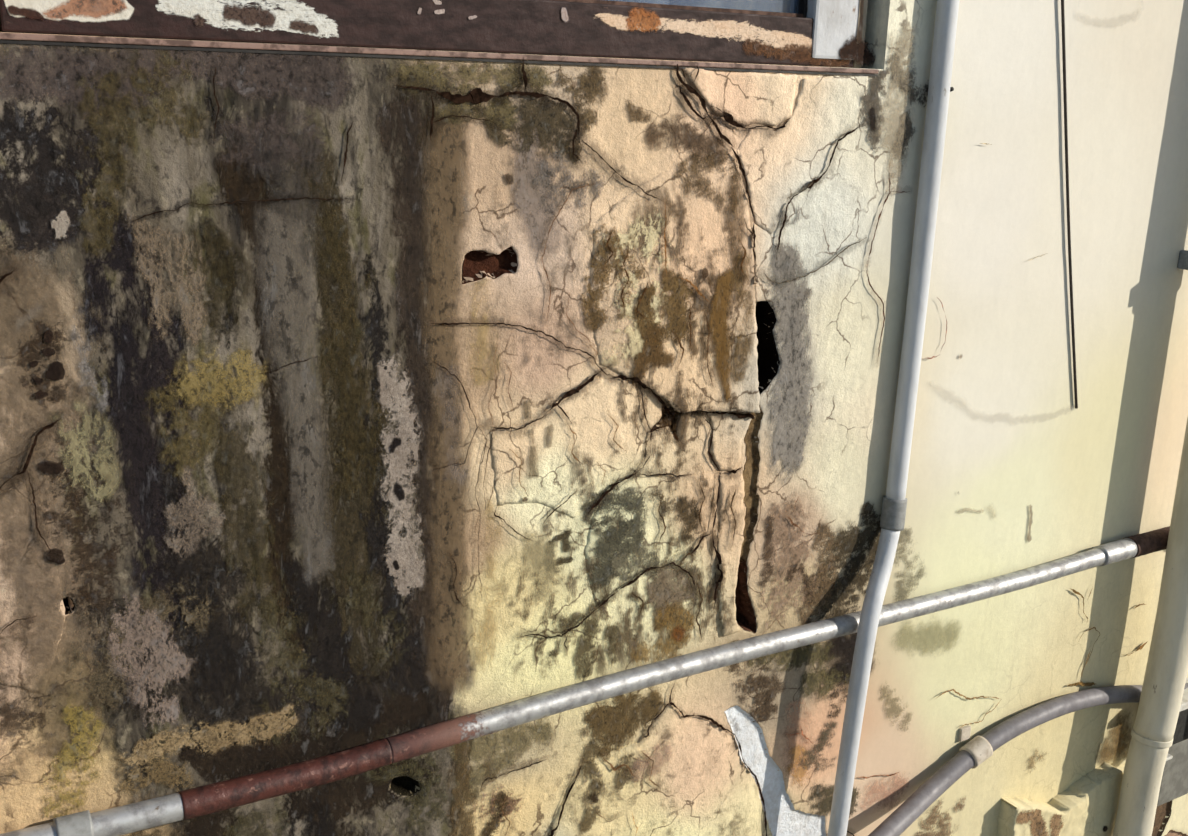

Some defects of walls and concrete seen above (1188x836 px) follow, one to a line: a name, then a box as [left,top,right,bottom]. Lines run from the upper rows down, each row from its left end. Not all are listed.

peeling [4,0,134,22]
peeling [155,0,339,38]
water stain [0,39,607,804]
flaking render [462,246,518,284]
crack [394,57,754,649]
peeling [584,301,780,637]
water stain [769,244,813,483]
crack [676,64,910,361]
water stain [132,718,553,836]
crack [549,683,767,836]
water stain [726,633,857,816]
crack [1068,589,1100,686]